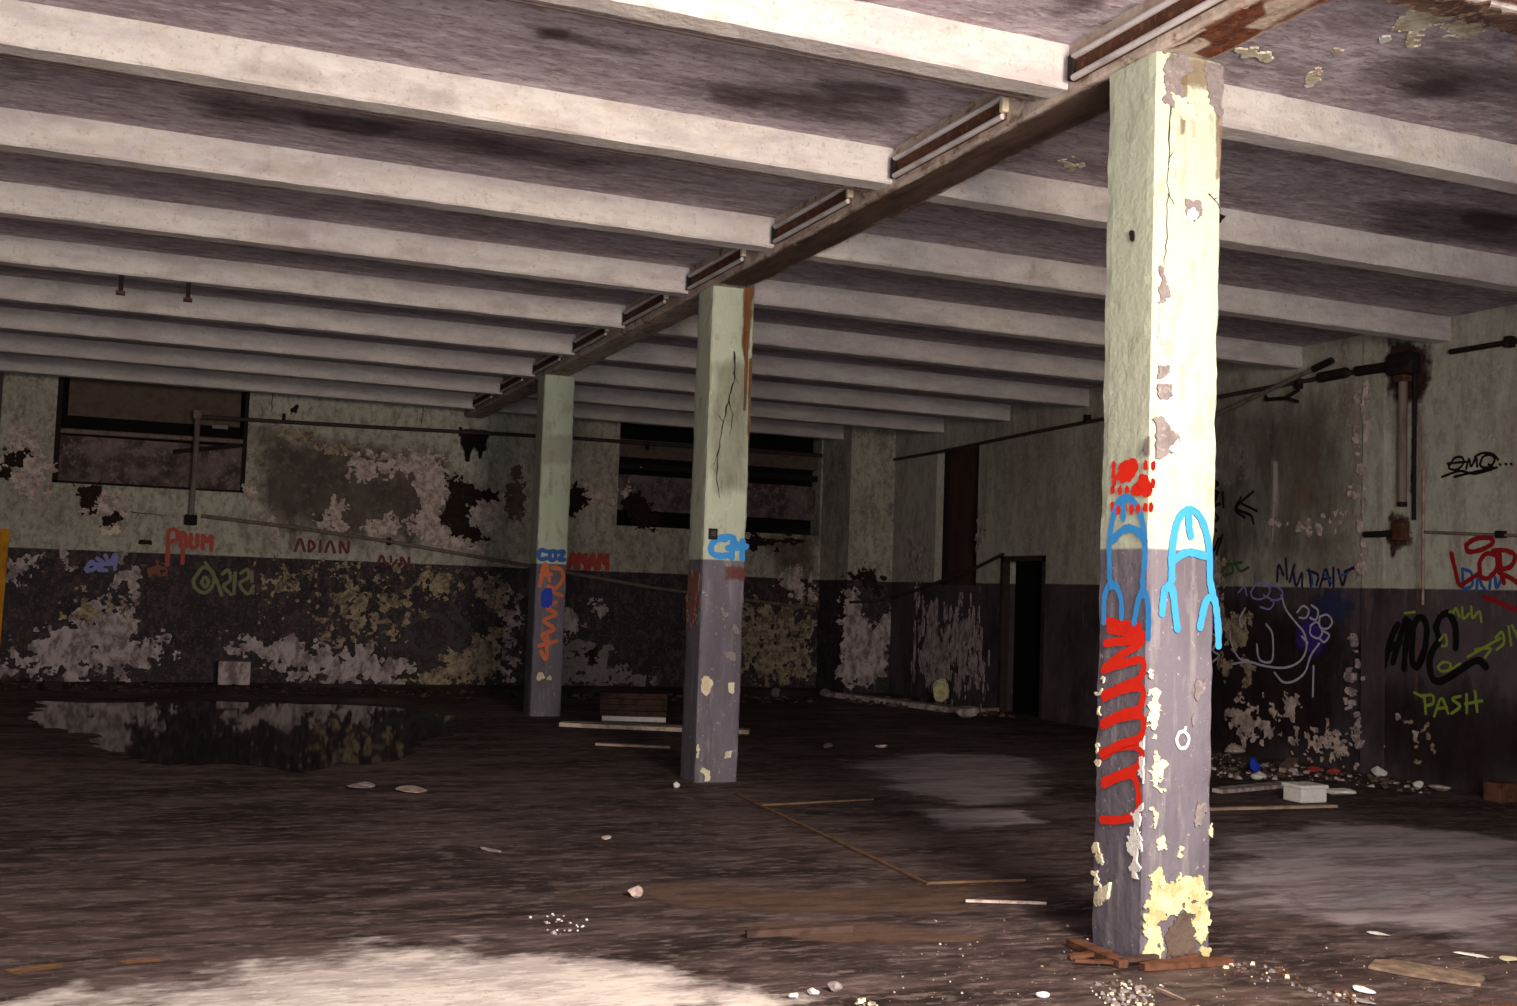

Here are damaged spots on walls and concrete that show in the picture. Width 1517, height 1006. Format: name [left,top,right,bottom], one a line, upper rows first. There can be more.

damp [714,84,897,120]
peeling [1162,51,1224,123]
rust [1174,0,1328,178]
spalling [1379,0,1517,49]
rust [721,81,1110,436]
spalling [1142,365,1181,459]
peeling [218,405,528,685]
peeling [701,530,891,696]
peeling [911,586,990,708]
peeling [1191,554,1365,770]
flaking render [1091,842,1112,907]
peeling [1126,669,1213,959]